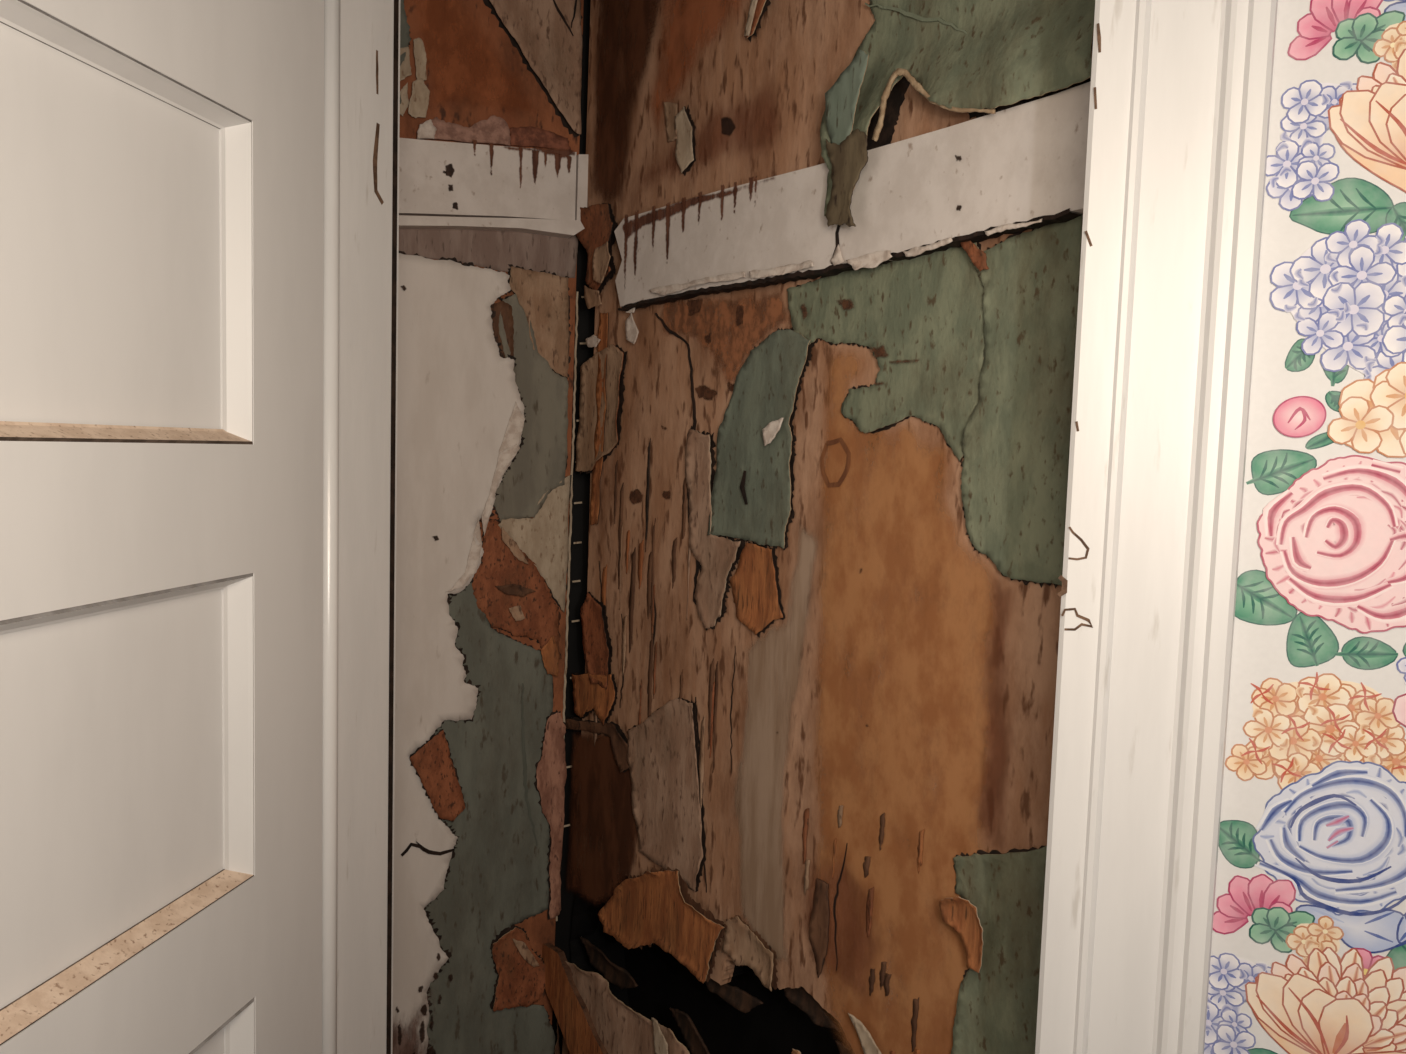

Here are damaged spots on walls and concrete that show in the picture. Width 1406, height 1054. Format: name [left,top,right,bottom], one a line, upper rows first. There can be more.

peeling [744,0,771,43]
peeling [400,38,430,119]
peeling [663,101,696,175]
peeling [576,203,618,309]
peeling [961,241,989,272]
peeling [586,335,601,347]
peeling [625,308,639,344]
peeling [762,418,784,446]
peeling [393,251,562,1054]
spalling [570,890,854,1054]